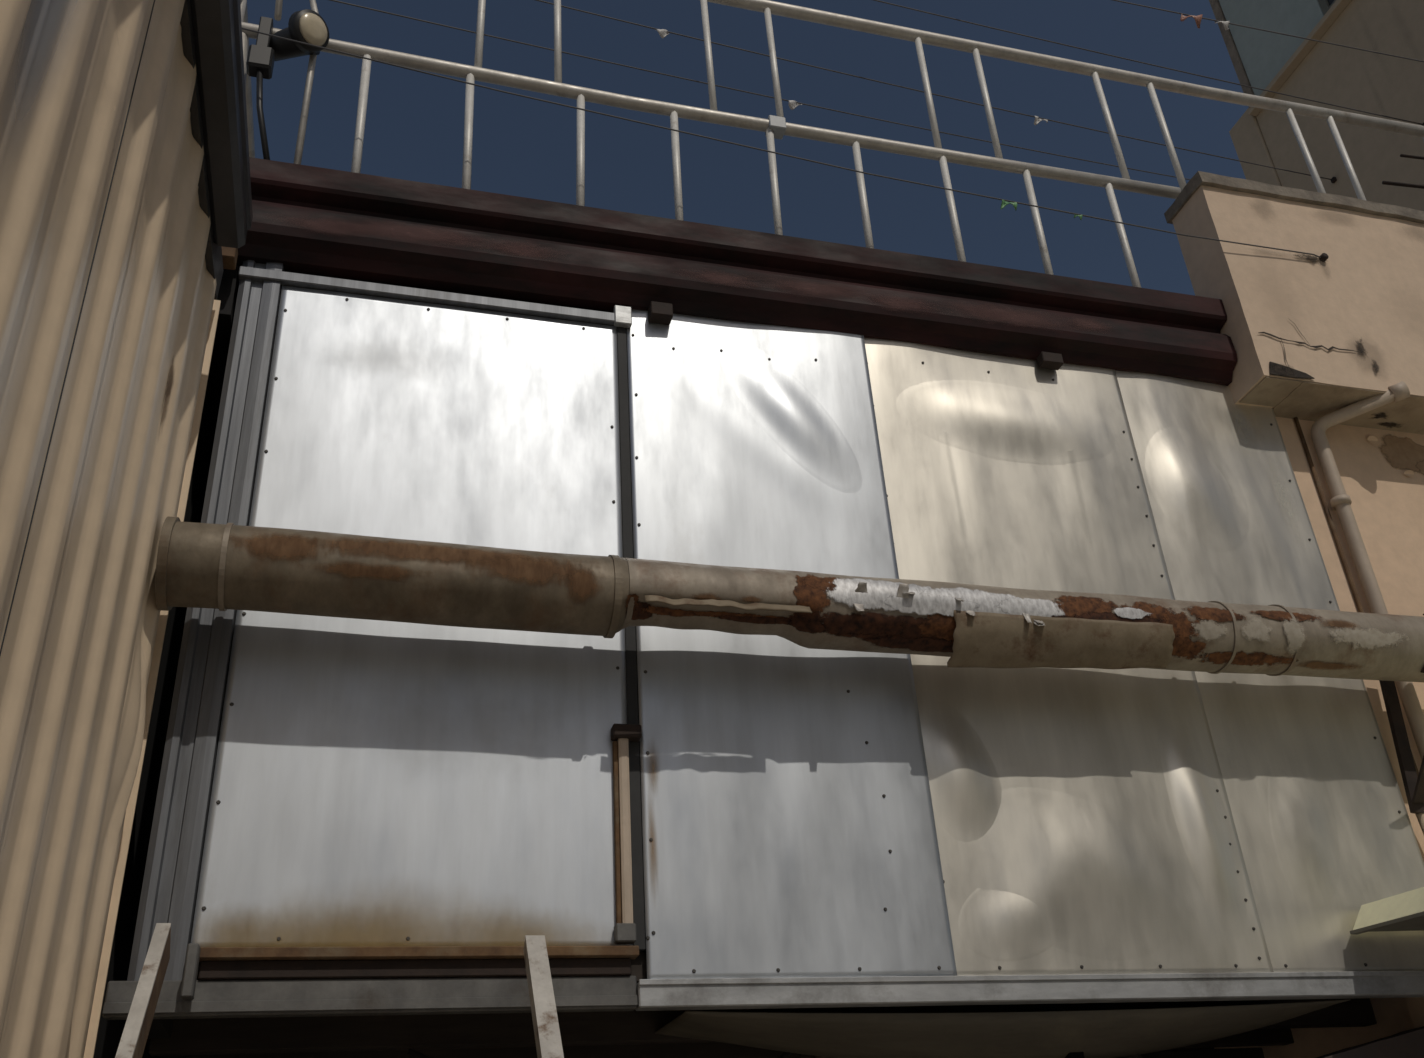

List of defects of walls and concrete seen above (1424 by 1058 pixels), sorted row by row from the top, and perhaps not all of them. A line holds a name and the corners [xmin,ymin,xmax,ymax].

crack [1258,318,1358,366]
peeling [1367,435,1424,476]
corrosion [625,574,956,653]
peeling [829,578,1065,626]
peeling [1114,607,1152,619]
corrosion [1052,595,1360,670]